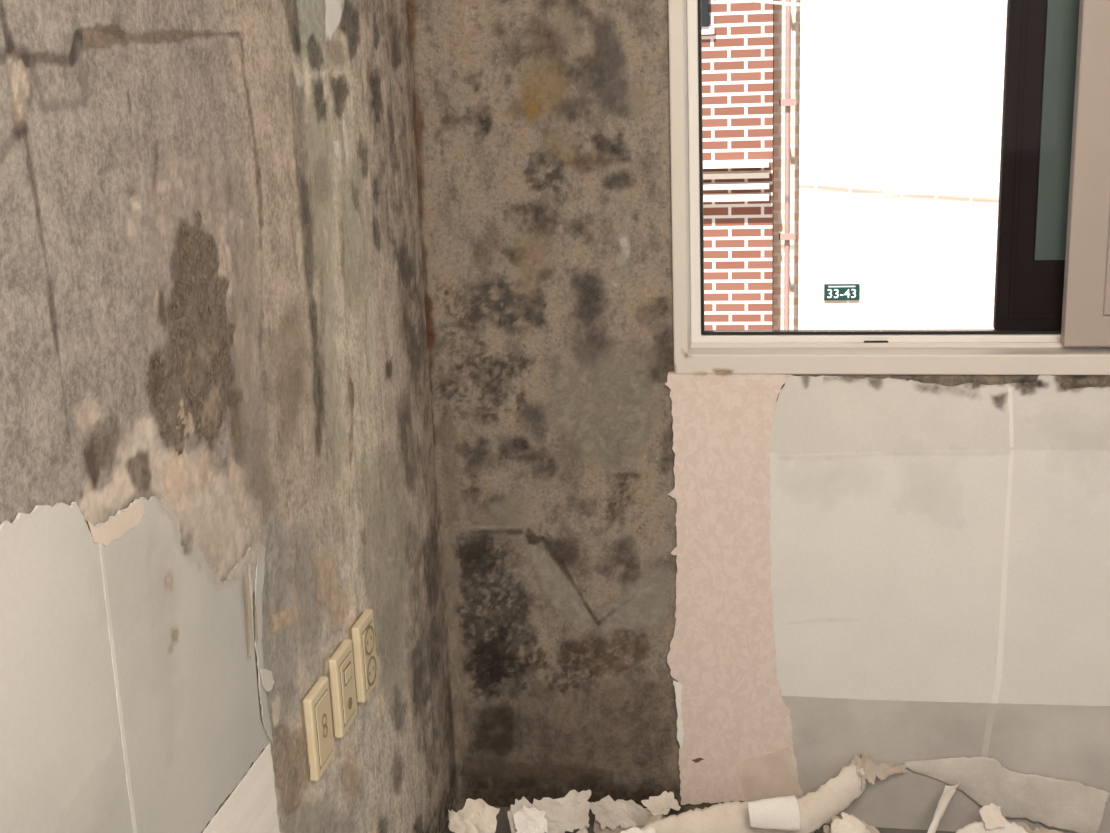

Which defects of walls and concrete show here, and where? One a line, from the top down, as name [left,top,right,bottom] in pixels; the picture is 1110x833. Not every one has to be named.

crack [0,0,243,107]
rust [406,0,415,43]
crack [2,132,40,225]
damp [273,0,360,454]
damp [359,78,412,212]
rust [413,99,423,215]
crack [49,294,59,354]
rust [424,297,435,350]
spalling [1056,375,1110,391]
flaking render [77,156,345,812]
damp [455,532,646,696]
damp [472,779,679,812]